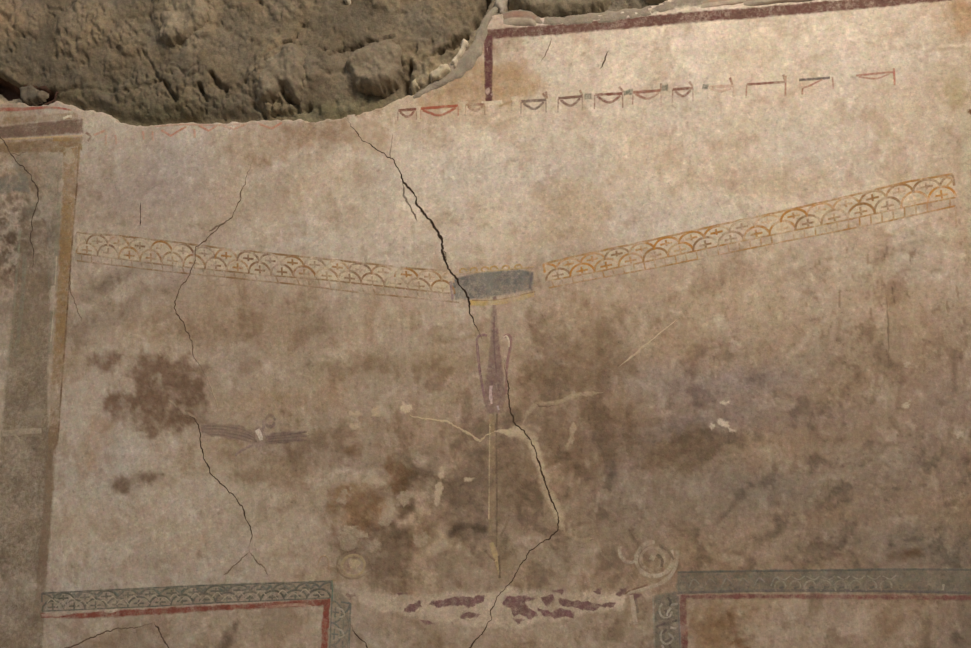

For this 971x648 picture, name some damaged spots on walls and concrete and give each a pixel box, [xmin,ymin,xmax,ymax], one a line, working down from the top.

spalling [0,0,702,126]
spalling [0,211,26,271]
crack [0,137,39,267]
crack [346,117,479,331]
leakage [70,336,220,499]
crack [168,161,268,575]
leakage [206,437,330,506]
crack [408,360,603,648]
crack [65,624,170,648]